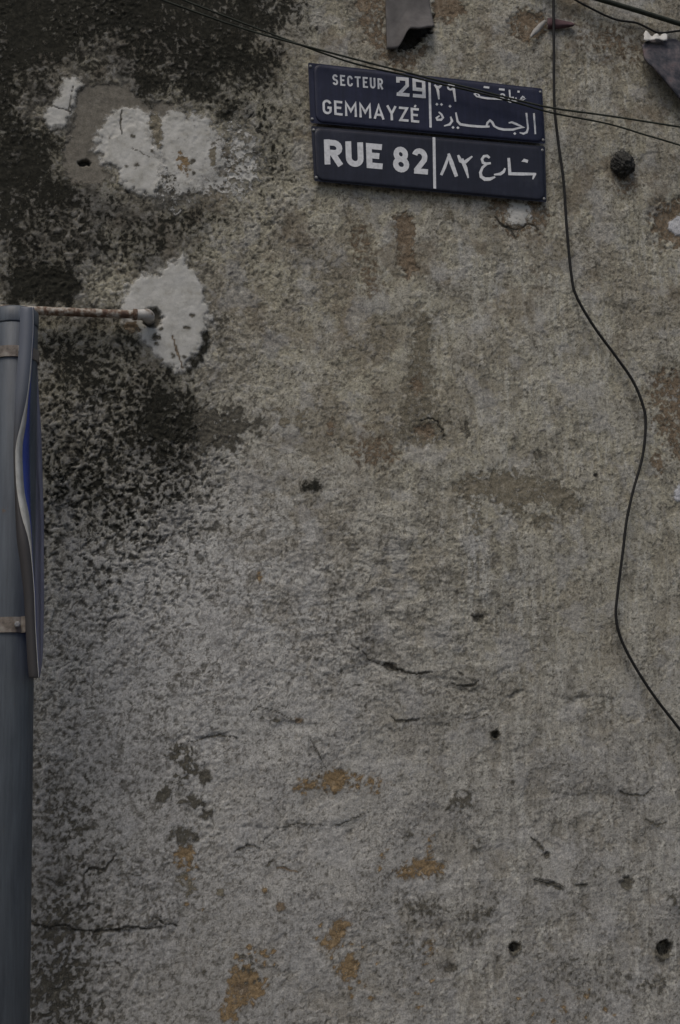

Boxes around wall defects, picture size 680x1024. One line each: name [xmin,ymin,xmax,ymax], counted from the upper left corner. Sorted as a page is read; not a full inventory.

flaking render [62,82,173,184]
damp [0,0,318,547]
crack [347,643,477,687]
corrosion [293,768,382,796]
crack [31,855,177,954]
corrosion [168,826,200,906]
corrosion [378,834,444,880]
corrosion [219,944,276,1023]
corrosion [315,919,374,1001]